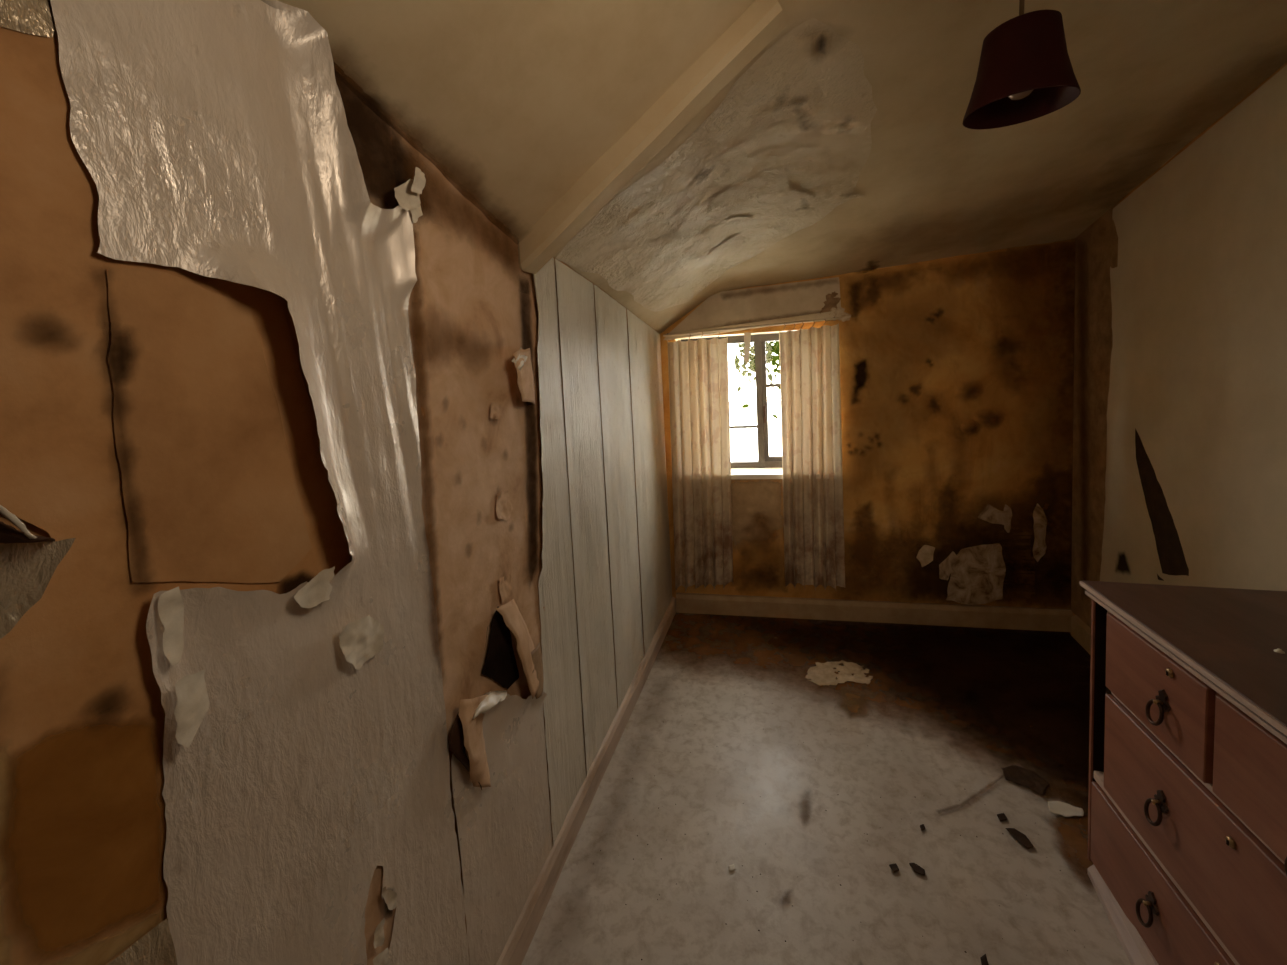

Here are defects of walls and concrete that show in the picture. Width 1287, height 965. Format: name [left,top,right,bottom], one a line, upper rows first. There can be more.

peeling [334,70,545,747]
leakage [853,360,867,402]
peeling [294,566,335,608]
leakage [842,468,1073,607]
peeling [158,587,210,748]
spalling [365,865,397,965]